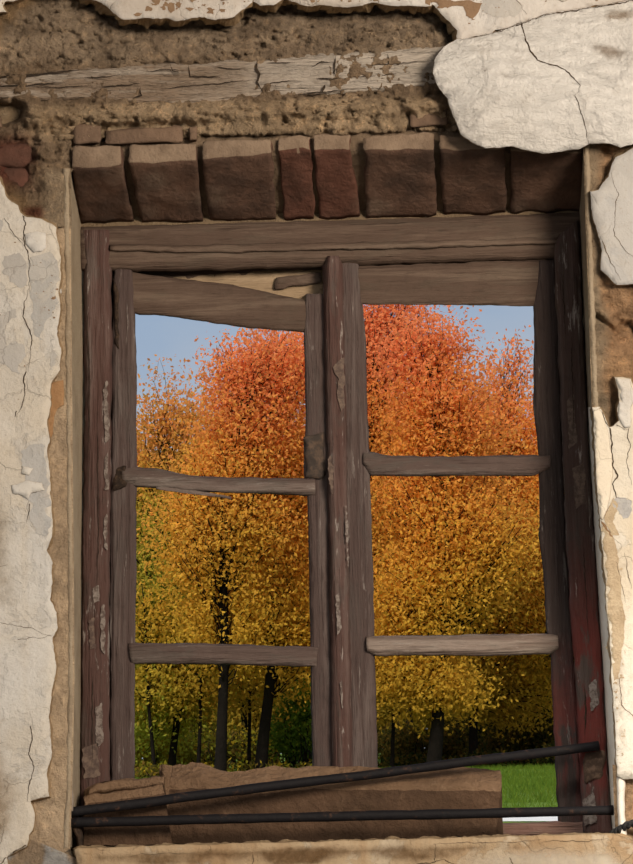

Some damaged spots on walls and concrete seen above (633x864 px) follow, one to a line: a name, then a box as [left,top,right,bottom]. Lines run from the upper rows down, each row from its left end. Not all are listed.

crack [462,0,629,142]
crack [4,216,32,418]
flaking render [0,0,459,864]
flaking render [583,144,633,835]
crack [598,412,632,596]
crack [26,726,34,801]
damp [264,849,349,864]
damp [381,848,429,858]
crack [419,838,607,864]